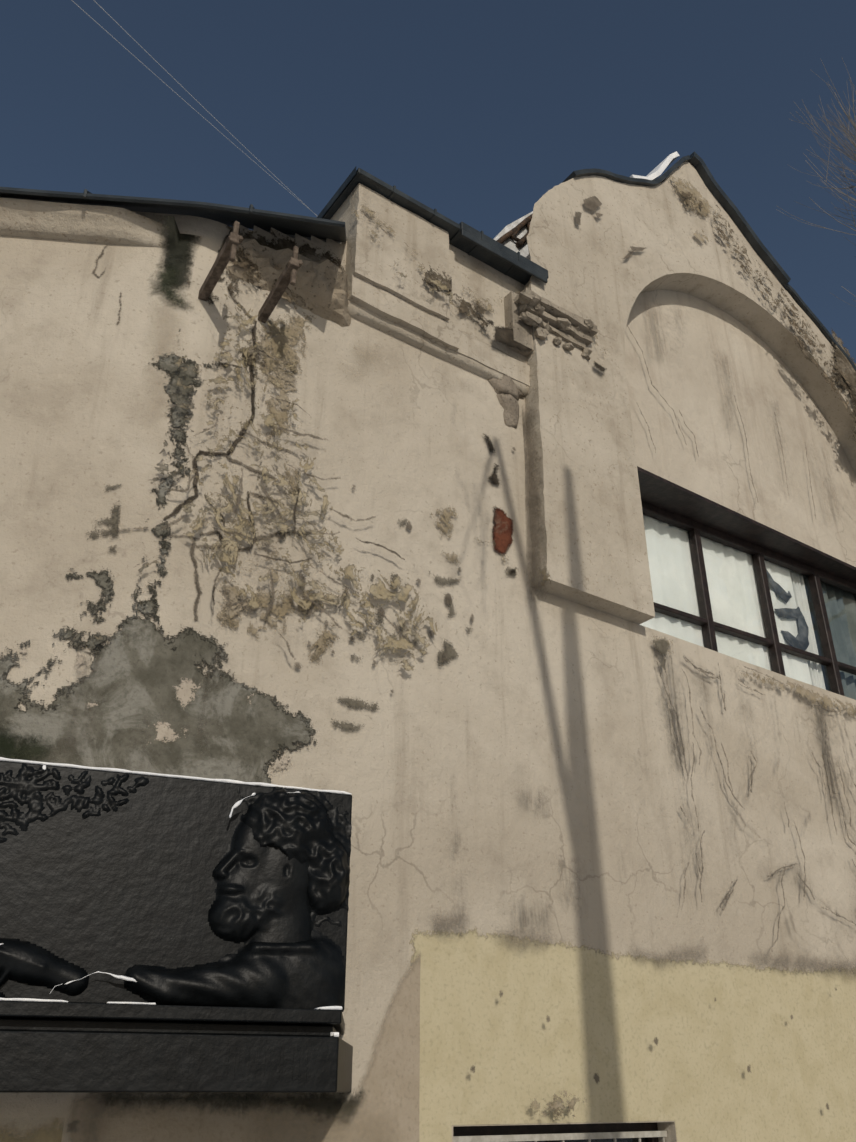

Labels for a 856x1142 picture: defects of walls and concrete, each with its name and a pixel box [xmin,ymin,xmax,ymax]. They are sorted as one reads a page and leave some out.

water stain [161,215,198,288]
crack [216,229,232,259]
flaking render [670,176,856,441]
flaking render [0,221,461,784]
crack [161,289,407,660]
water stain [23,739,48,760]
crack [657,654,778,910]
crack [812,701,856,867]
crack [767,812,856,943]